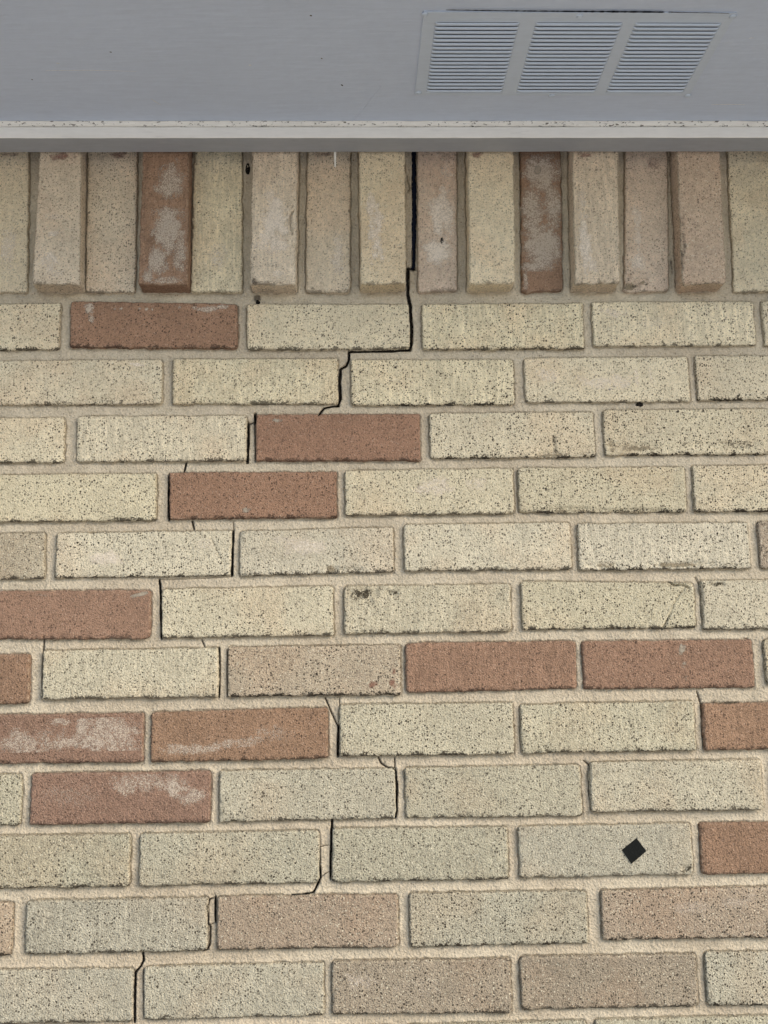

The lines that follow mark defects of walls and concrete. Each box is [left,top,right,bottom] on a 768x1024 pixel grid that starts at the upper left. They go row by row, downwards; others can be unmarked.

crack [319,152,417,415]
crack [247,414,256,463]
crack [167,463,194,529]
crack [159,522,234,639]
efflorescence [1,717,138,753]
efflorescence [168,737,259,754]
crack [325,698,340,755]
efflorescence [114,774,205,803]
crack [378,757,398,818]
crack [291,821,333,895]
crack [204,896,216,951]
crack [134,953,144,1023]